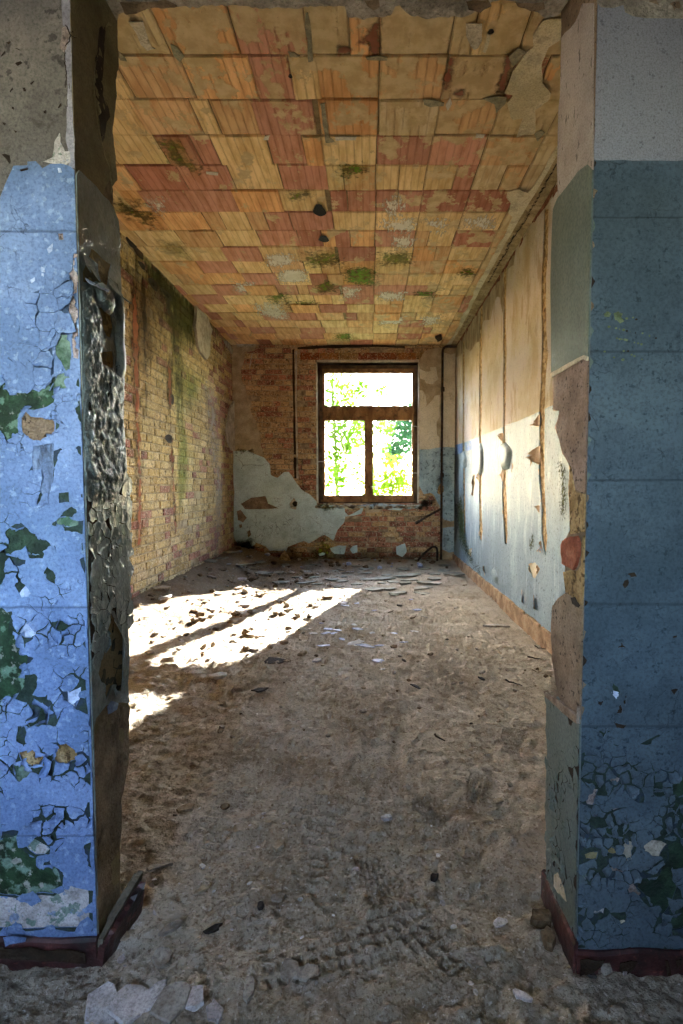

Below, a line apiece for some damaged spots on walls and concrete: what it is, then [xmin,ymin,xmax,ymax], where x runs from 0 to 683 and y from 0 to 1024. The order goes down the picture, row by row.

peeling [466,0,491,53]
peeling [504,2,561,138]
peeling [0,249,110,446]
peeling [419,147,557,557]
peeling [0,526,43,579]
crack [0,268,134,937]
spalling [237,496,277,548]
spalling [532,355,594,724]
spalling [0,607,130,932]
crack [542,692,683,950]